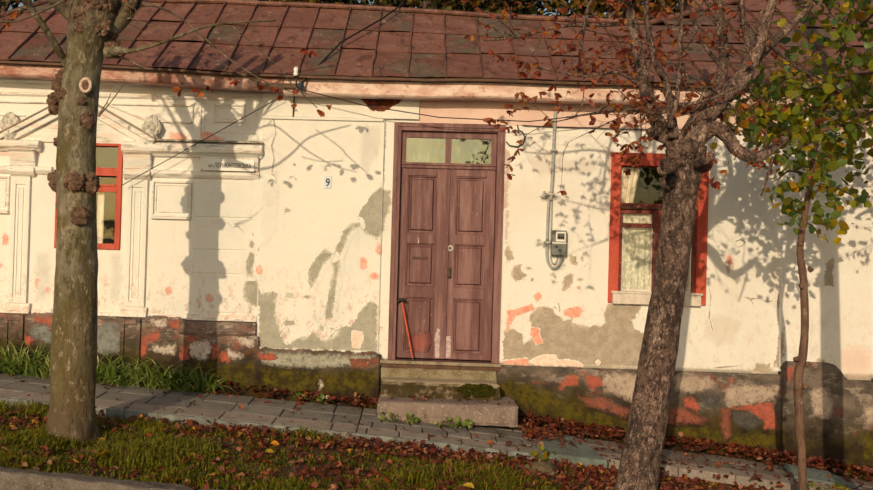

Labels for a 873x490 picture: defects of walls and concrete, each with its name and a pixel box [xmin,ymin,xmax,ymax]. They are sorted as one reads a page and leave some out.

spalling [140,181,392,392]
spalling [818,253,838,293]
spalling [23,312,53,350]
spalling [97,317,121,360]
spalling [499,237,647,421]
damp [695,389,763,433]